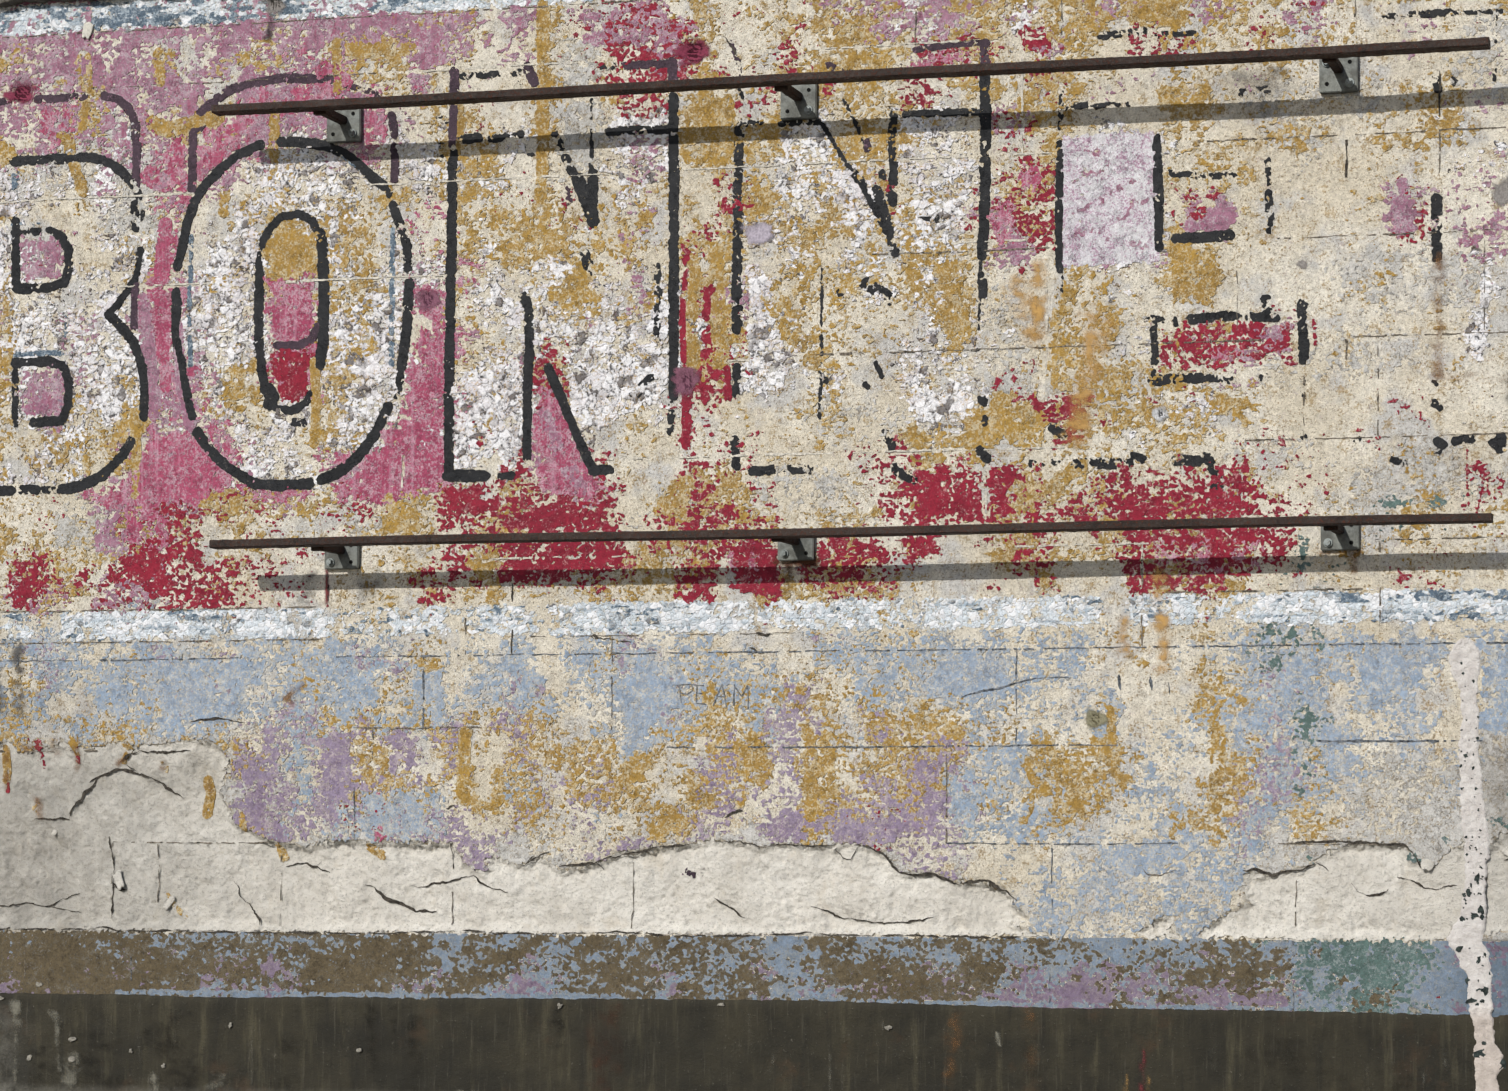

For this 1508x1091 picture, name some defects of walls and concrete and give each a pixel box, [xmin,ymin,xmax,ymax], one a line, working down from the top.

peeling [732,0,1367,74]
peeling [339,108,390,176]
peeling [1152,0,1508,312]
peeling [1067,178,1150,241]
peeling [19,226,82,283]
peeling [454,386,494,434]
peeling [588,404,657,466]
peeling [1387,389,1431,427]
peeling [1386,566,1412,591]
crack [36,717,244,821]
crack [0,809,1019,939]
crack [1243,840,1457,897]